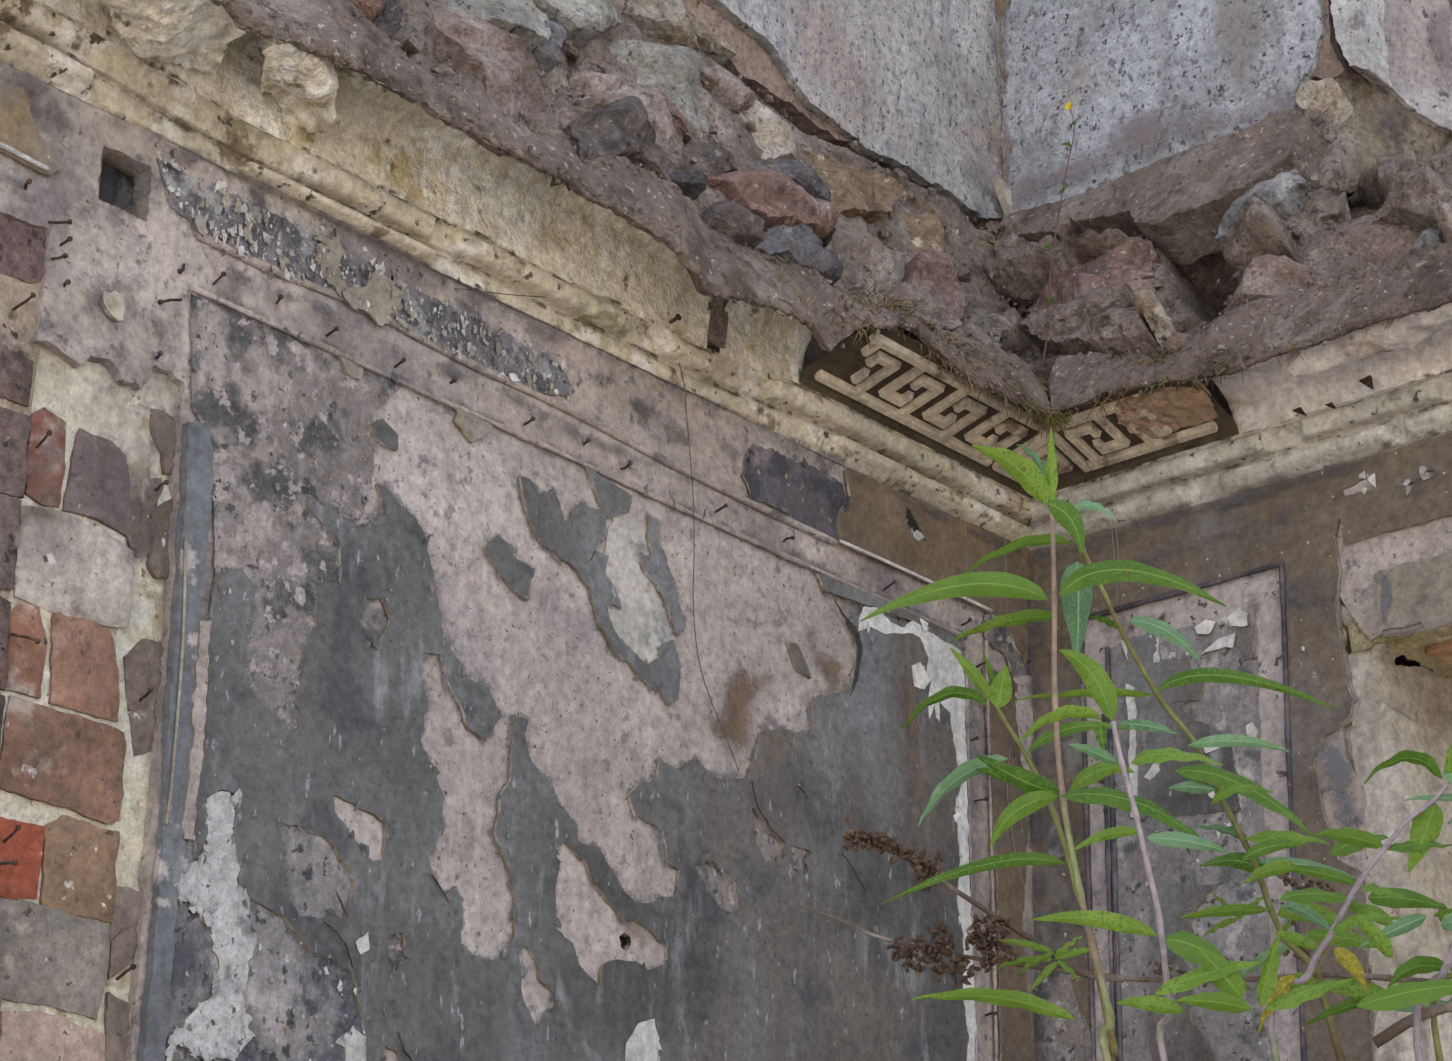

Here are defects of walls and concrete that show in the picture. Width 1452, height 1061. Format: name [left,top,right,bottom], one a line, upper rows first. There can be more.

spalling [1330,0,1392,88]
flaking render [992,177,1016,217]
peeling [154,142,587,416]
spalling [1287,303,1452,377]
peeling [33,290,980,1061]
peeling [983,612,1034,772]
peeling [1121,607,1256,832]
peeling [1246,722,1260,738]
peeling [1134,866,1218,1061]